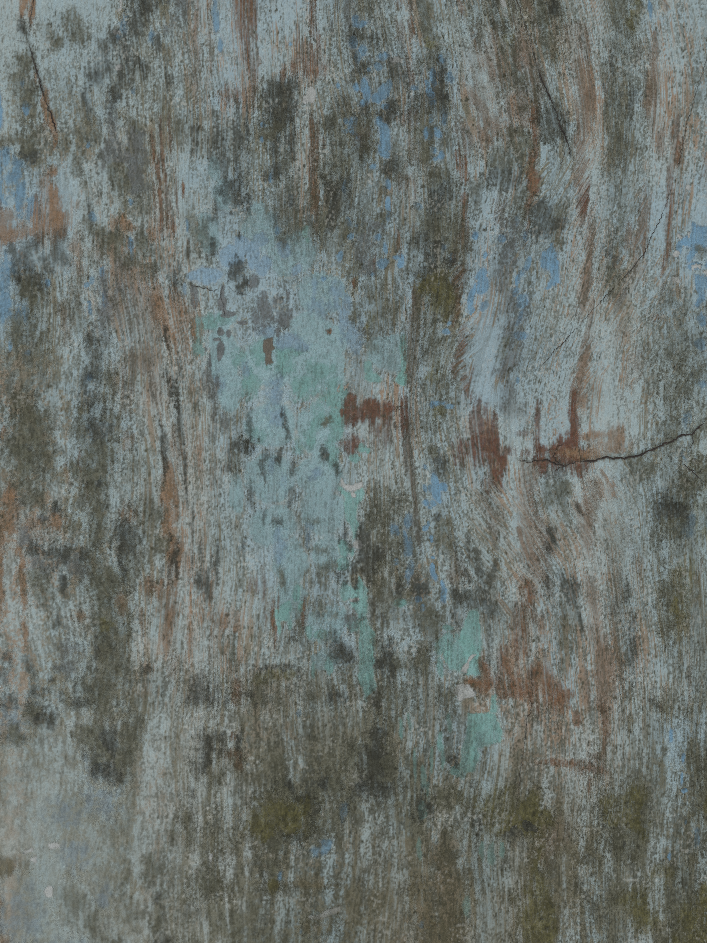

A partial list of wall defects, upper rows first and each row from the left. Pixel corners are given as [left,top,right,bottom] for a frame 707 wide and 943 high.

crack [18,0,56,131]
crack [539,190,671,369]
crack [522,421,705,483]